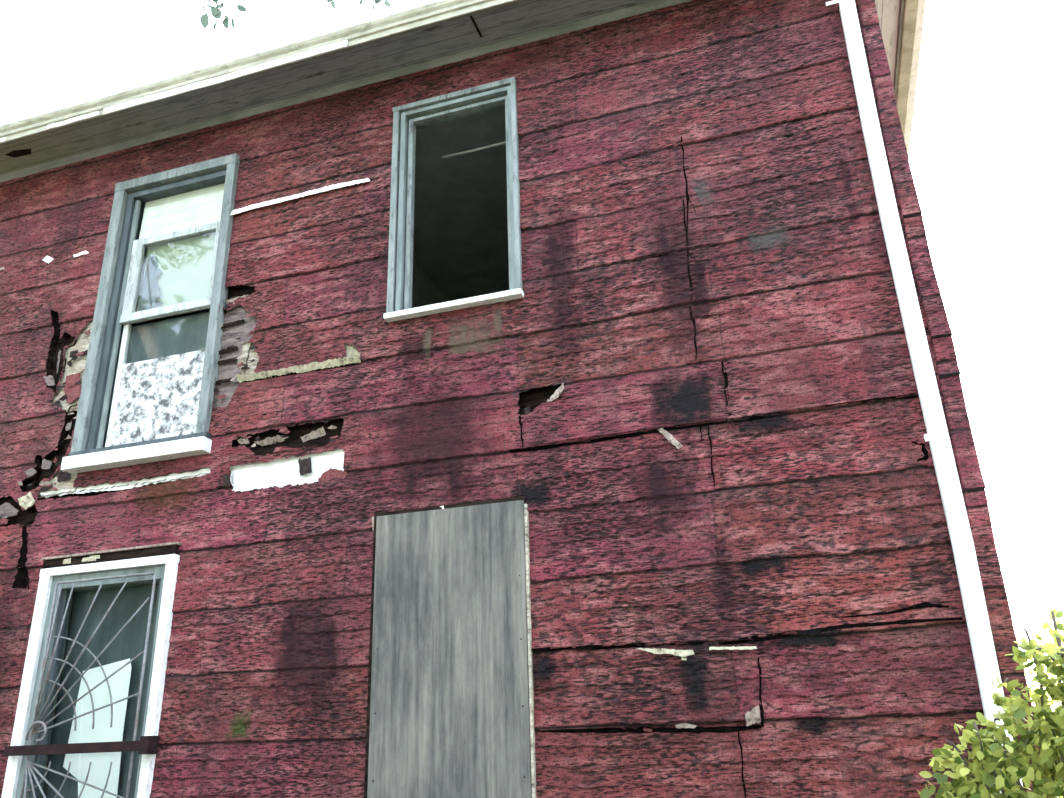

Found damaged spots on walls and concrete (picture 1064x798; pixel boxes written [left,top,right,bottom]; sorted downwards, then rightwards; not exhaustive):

crack [681,136,729,491]
peeling [227,331,259,381]
peeling [547,383,565,402]
peeling [0,349,88,525]
peeling [232,418,347,482]
peeling [63,555,100,564]